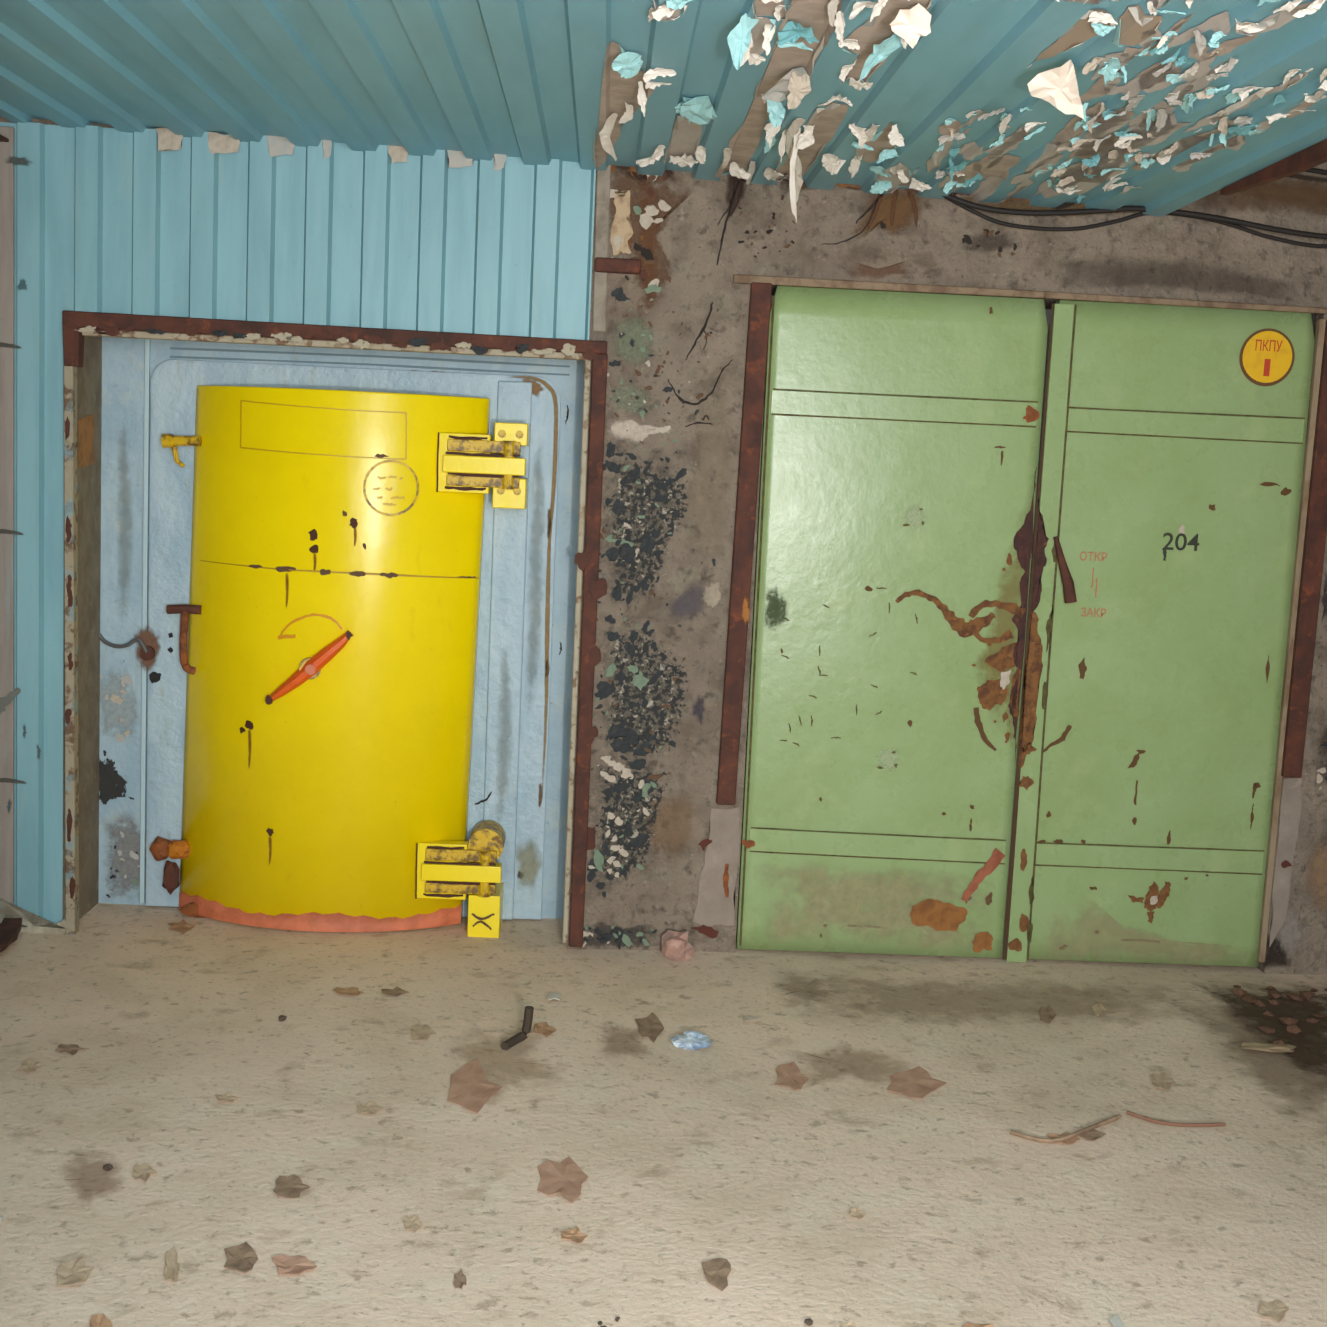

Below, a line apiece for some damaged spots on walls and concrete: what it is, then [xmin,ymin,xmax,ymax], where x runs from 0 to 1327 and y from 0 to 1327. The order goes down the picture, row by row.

peeling [593,41,677,169]
peeling [636,0,1327,257]
flaking render [610,190,663,255]
corrosion [64,323,598,361]
corrosion [436,432,520,492]
corrosion [308,529,331,575]
corrosion [516,376,558,807]
water stain [673,590,704,615]
corrosion [895,468,1072,790]
corrosion [415,843,496,899]
corrosion [910,848,1005,931]
corrosion [972,849,1034,953]